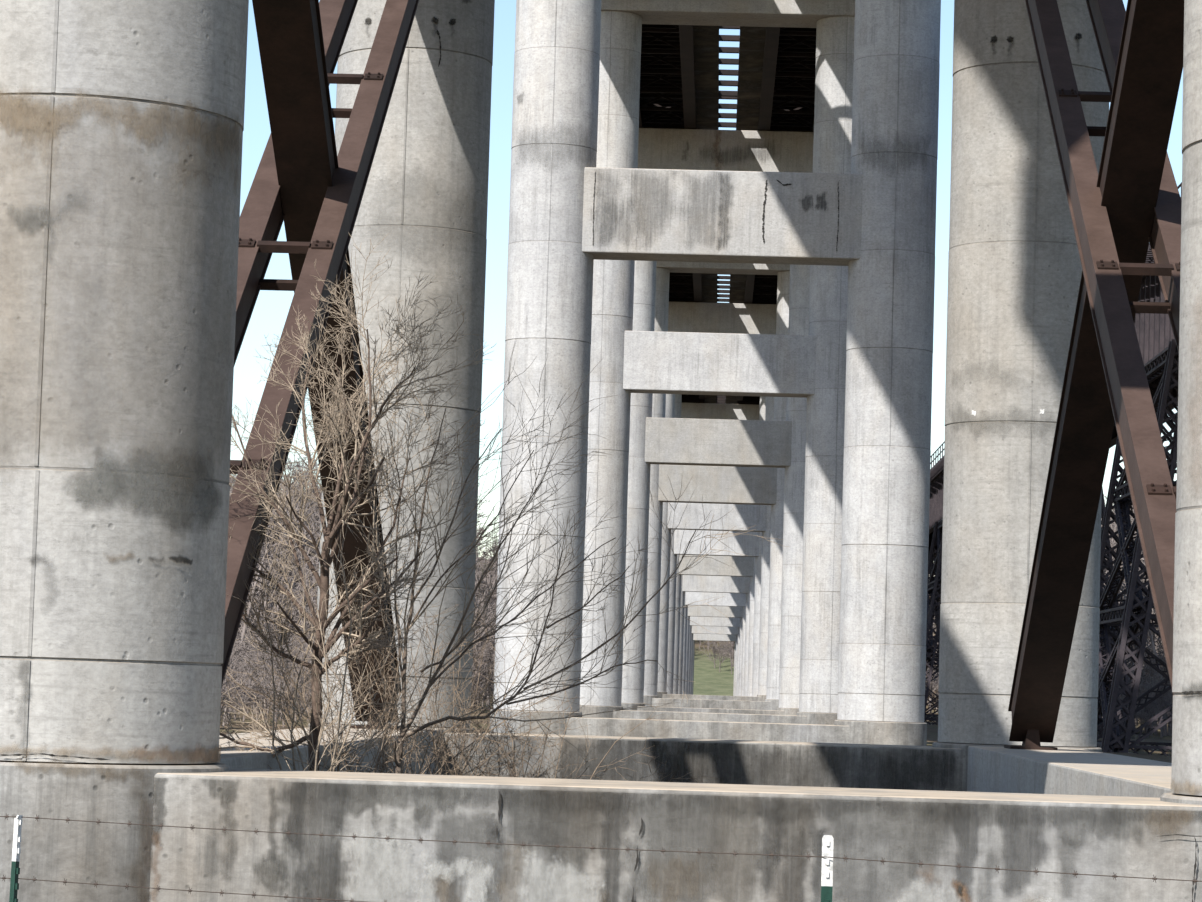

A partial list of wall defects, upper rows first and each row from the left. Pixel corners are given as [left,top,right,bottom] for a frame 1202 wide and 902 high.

leakage [0,95,240,151]
leakage [718,175,730,249]
leakage [75,450,219,527]
leakage [208,779,235,803]
leakage [288,782,506,902]
leakage [524,739,1141,902]
leakage [1158,809,1202,822]